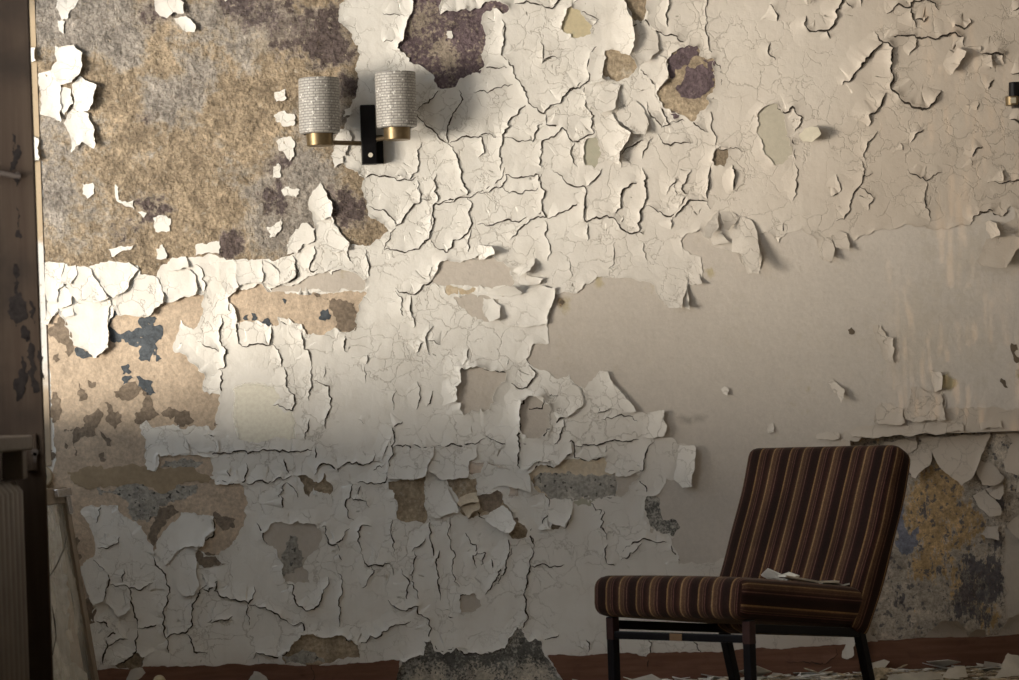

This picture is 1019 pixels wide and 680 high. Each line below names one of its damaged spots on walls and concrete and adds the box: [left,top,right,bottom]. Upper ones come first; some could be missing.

peeling [386,0,521,102]
crack [279,0,746,328]
peeling [549,0,726,173]
peeling [701,138,738,177]
crack [756,0,1019,231]
peeling [7,0,393,646]
crack [88,262,713,680]
peeling [378,195,1019,642]
peeling [47,504,84,673]
peeling [103,645,158,680]
peeling [272,623,369,666]
peeling [838,637,855,659]